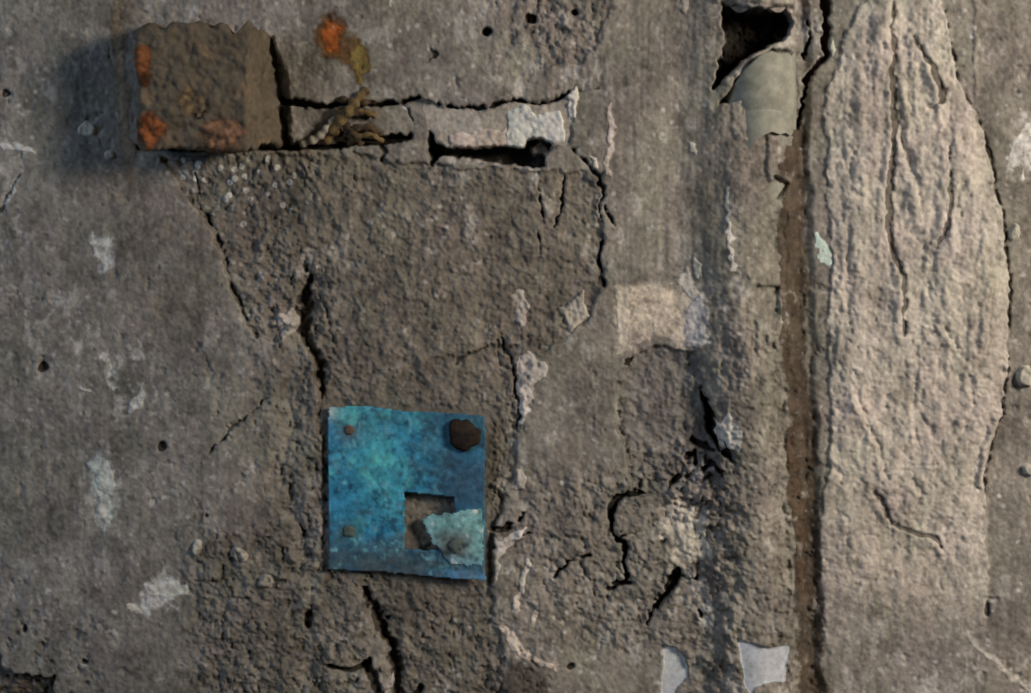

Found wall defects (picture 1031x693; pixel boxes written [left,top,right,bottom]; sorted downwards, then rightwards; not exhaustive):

rust [314,12,371,85]
spalling [712,6,789,89]
crack [169,149,258,338]
crack [257,90,592,161]
crack [538,148,615,287]
crack [945,10,1012,328]
crack [455,333,521,431]
crack [983,358,1010,493]
crack [553,554,592,579]
crack [593,488,645,593]
crack [646,566,698,624]